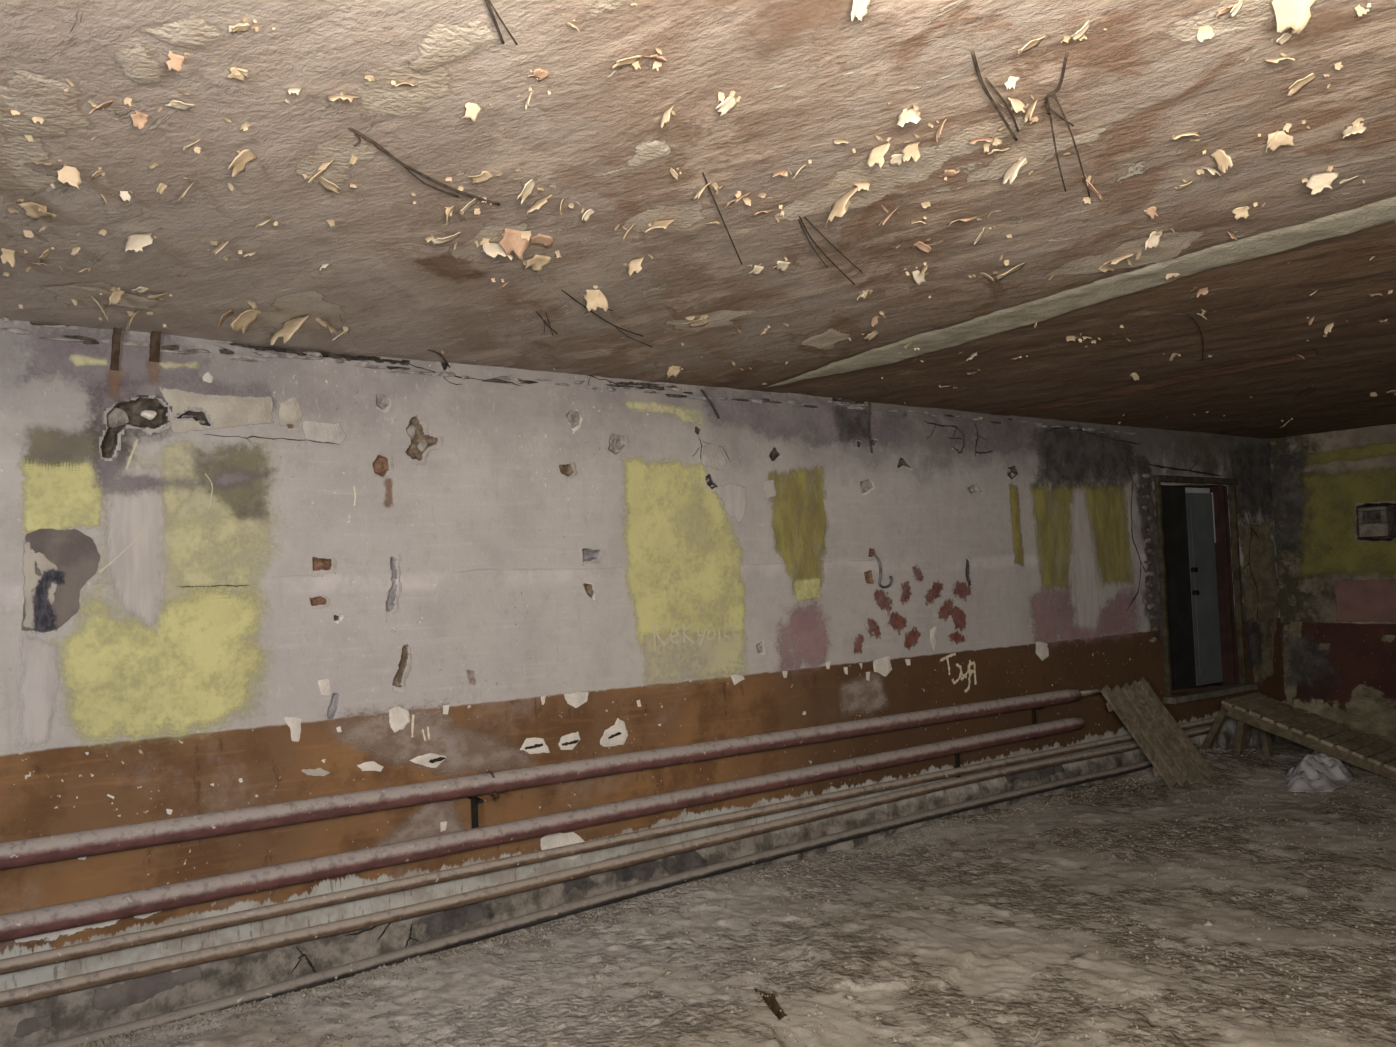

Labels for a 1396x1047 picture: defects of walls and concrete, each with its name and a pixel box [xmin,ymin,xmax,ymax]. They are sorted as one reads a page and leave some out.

peeling [851,0,871,21]
peeling [1165,0,1324,63]
peeling [1149,131,1233,189]
peeling [1258,120,1311,152]
peeling [1302,166,1366,195]
peeling [0,68,1136,483]
rust [109,328,122,396]
rust [148,331,162,382]
leakage [935,414,1140,487]
flaking render [23,542,58,629]
peeling [520,732,580,754]
peeling [600,718,628,747]